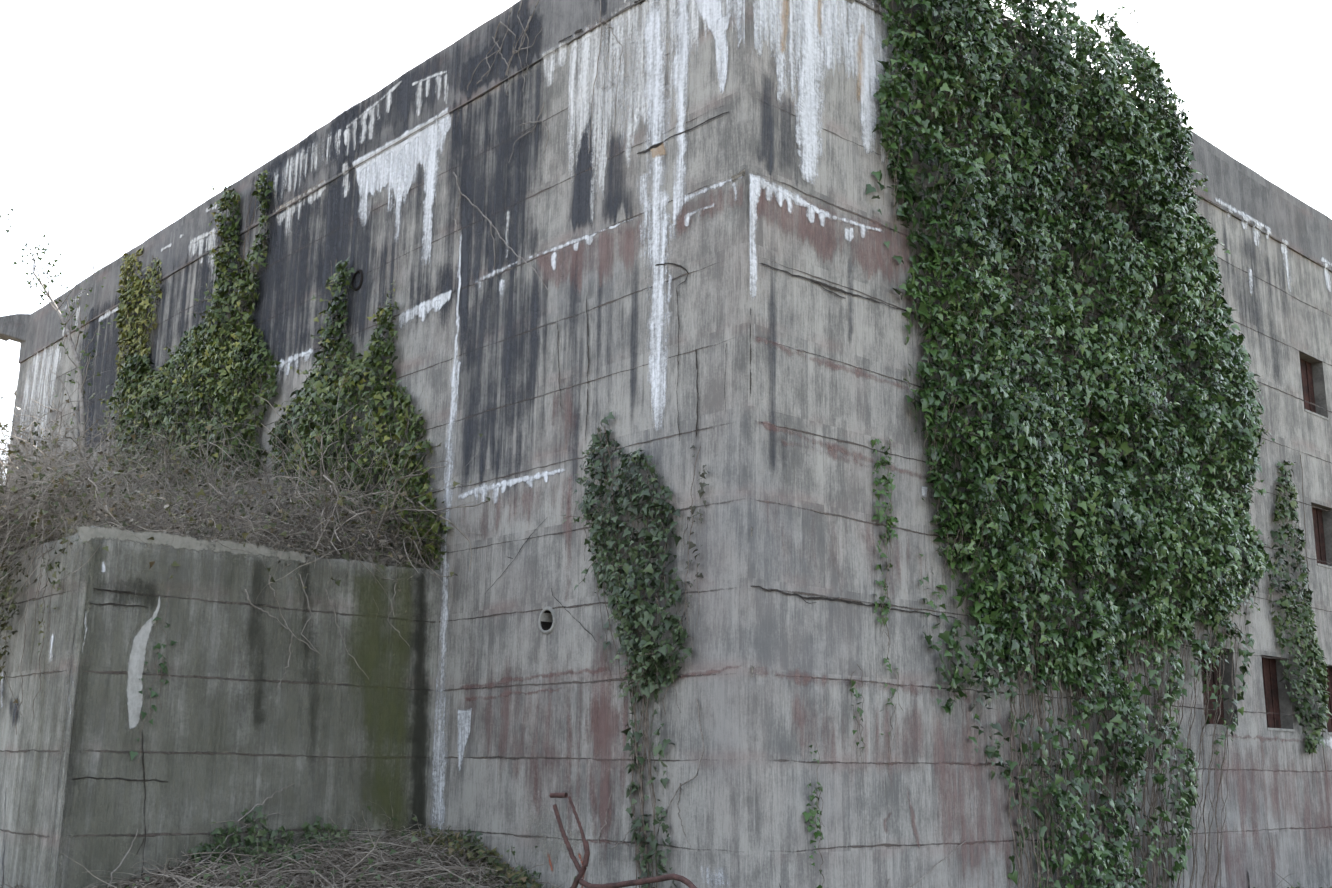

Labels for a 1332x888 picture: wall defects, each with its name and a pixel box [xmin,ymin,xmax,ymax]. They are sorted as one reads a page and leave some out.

water stain [1321,258,1332,292]
water stain [20,0,919,830]
water stain [0,671,19,725]
peeling [127,597,160,729]